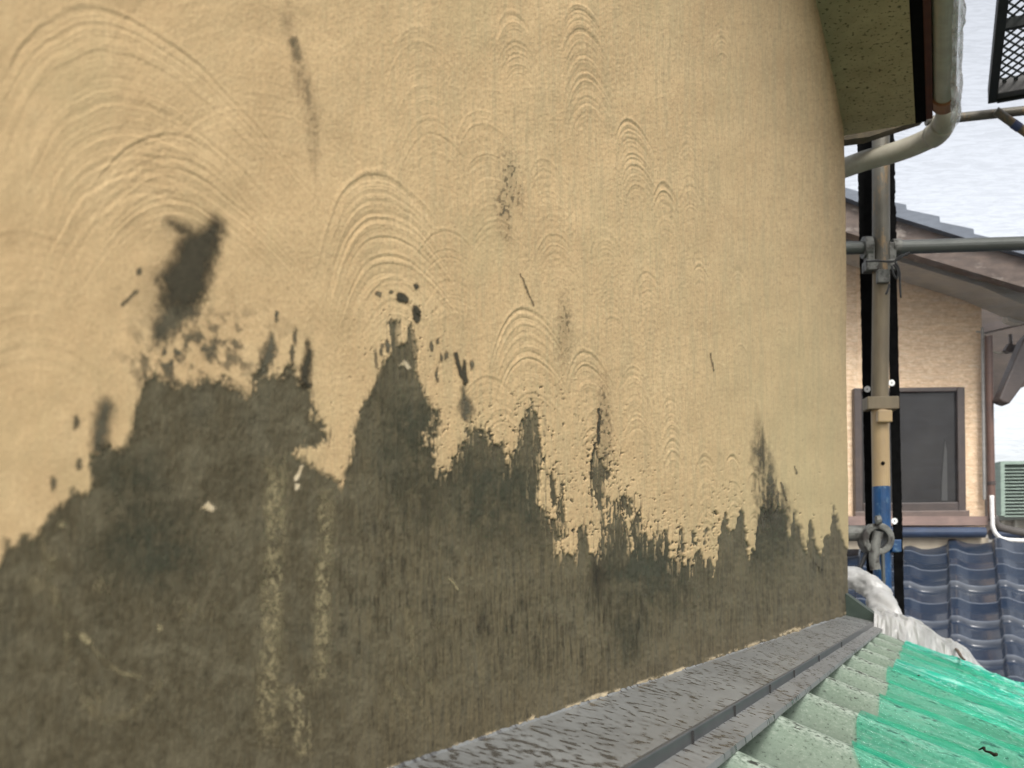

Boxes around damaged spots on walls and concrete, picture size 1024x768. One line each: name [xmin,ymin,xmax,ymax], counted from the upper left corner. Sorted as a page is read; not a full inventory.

water stain [260,311,279,374]
water stain [290,329,312,388]
water stain [430,338,474,420]
water stain [753,445,785,546]
water stain [259,471,311,755]
water stain [314,497,331,679]
water stain [595,543,683,596]